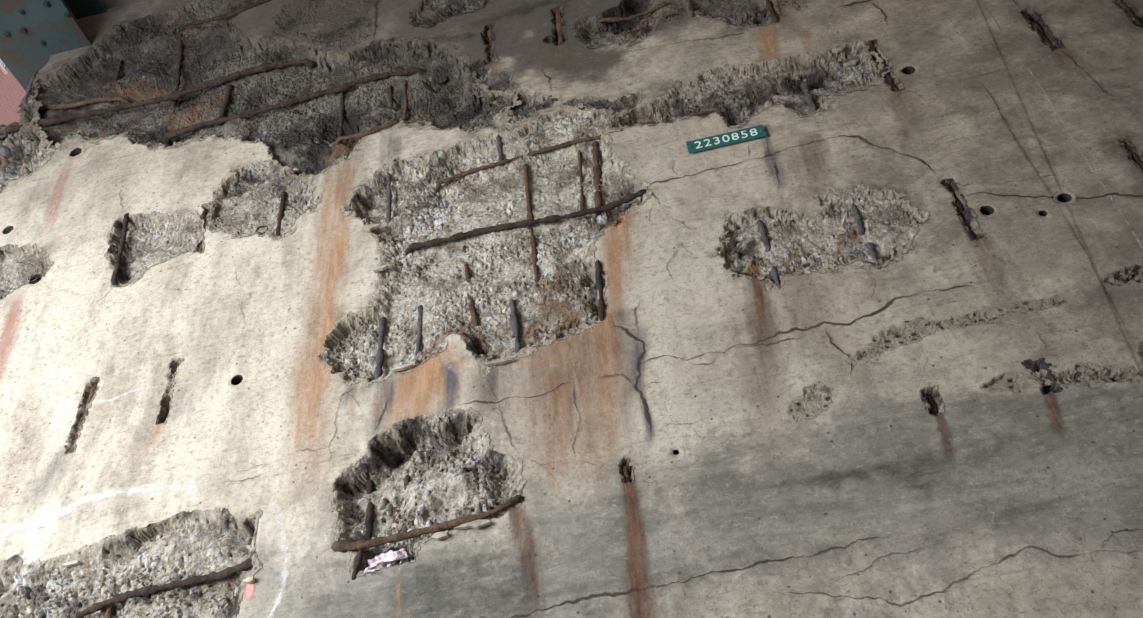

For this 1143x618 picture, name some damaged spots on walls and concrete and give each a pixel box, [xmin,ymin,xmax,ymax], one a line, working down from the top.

spalling [0,0,929,388]
rust [298,174,349,429]
rust [752,276,766,327]
crack [611,285,997,431]
spalling [0,508,262,618]
spalling [329,407,526,580]
rust [623,481,645,618]
crack [510,537,1075,618]